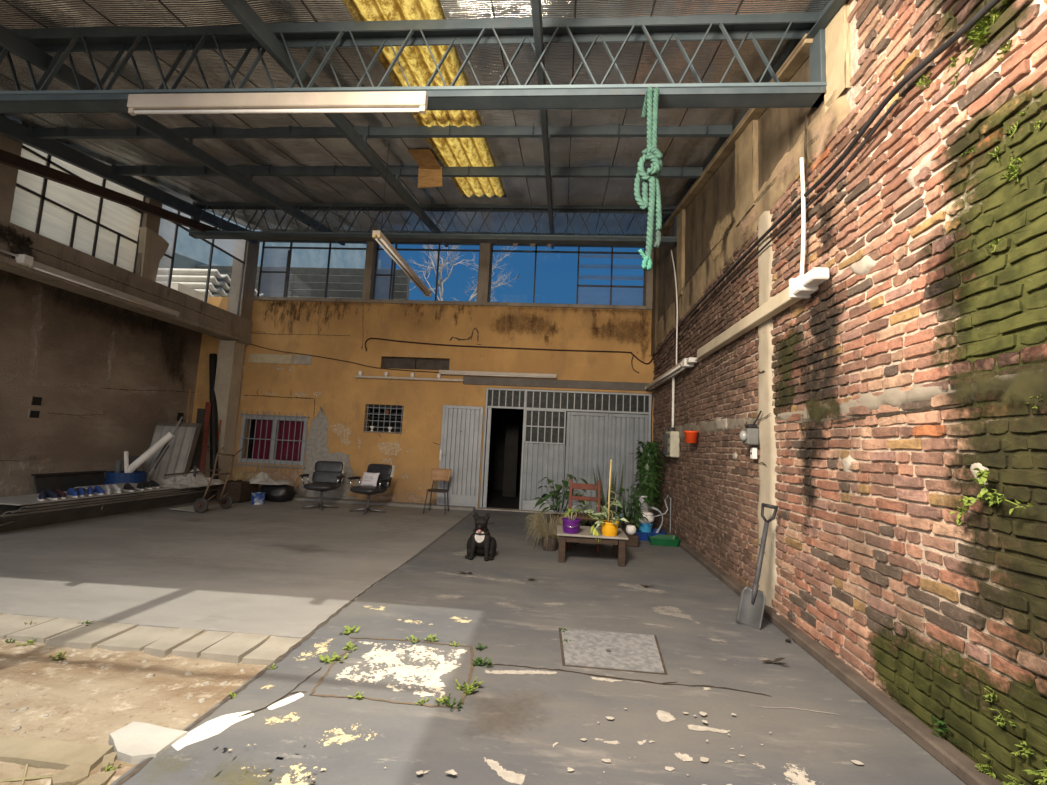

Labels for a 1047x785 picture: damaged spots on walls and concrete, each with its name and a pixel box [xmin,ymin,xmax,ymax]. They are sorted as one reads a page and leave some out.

water stain [947,122,995,184]
water stain [923,219,980,310]
water stain [772,325,840,423]
water stain [951,363,1047,408]
flaking render [294,392,361,499]
peeling [335,641,467,699]
peeling [774,763,824,785]